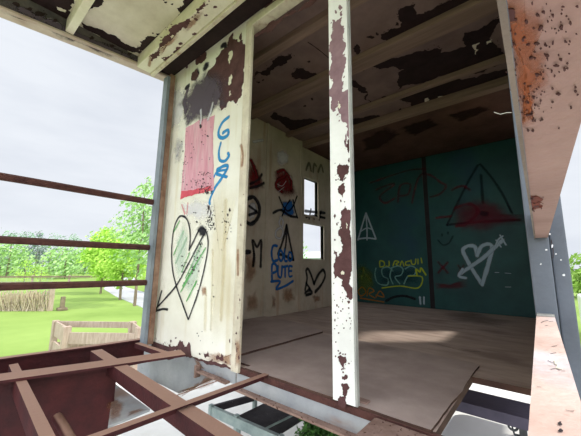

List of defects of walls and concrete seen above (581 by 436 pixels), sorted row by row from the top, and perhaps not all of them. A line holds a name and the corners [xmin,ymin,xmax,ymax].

peeling [26,0,74,22]
peeling [82,1,217,61]
peeling [186,52,207,81]
peeling [206,33,245,110]
peeling [367,0,469,41]
peeling [373,17,505,89]
peeling [399,64,508,106]
corrosion [510,13,541,117]
peeling [510,30,569,122]
peeling [308,5,380,334]
peeling [151,338,231,369]
peeling [335,350,350,408]